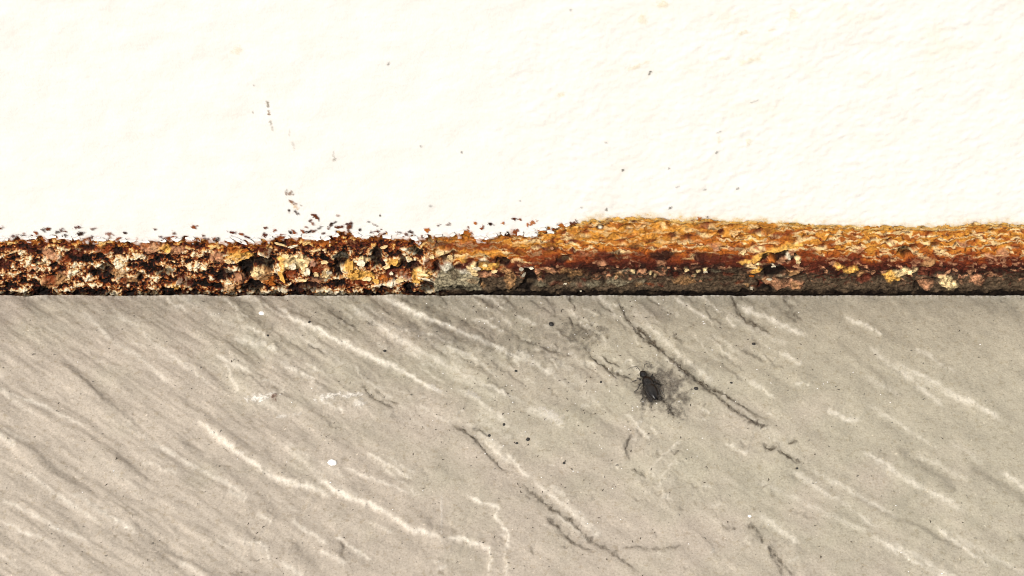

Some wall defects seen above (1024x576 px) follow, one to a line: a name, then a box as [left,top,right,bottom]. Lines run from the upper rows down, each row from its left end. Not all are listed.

corrosion [431,216,1024,296]